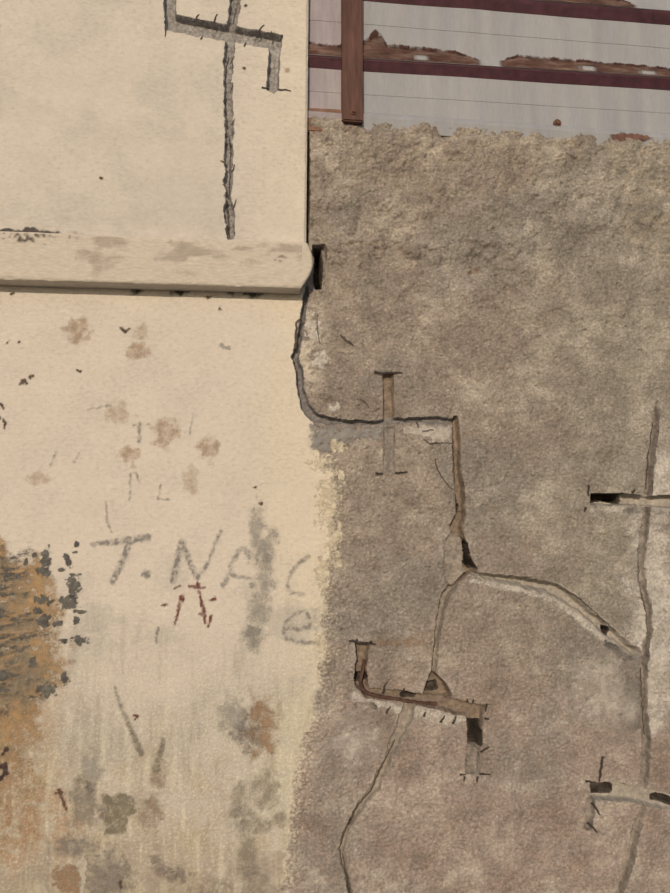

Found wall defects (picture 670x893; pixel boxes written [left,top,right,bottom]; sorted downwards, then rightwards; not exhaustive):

rust [308,41,342,56]
rust [363,29,480,65]
rust [501,54,670,77]
crack [220,0,241,240]
crack [290,286,661,893]
peeling [0,539,89,799]
damp [219,701,278,757]
damp [72,758,157,834]
damp [230,786,283,870]